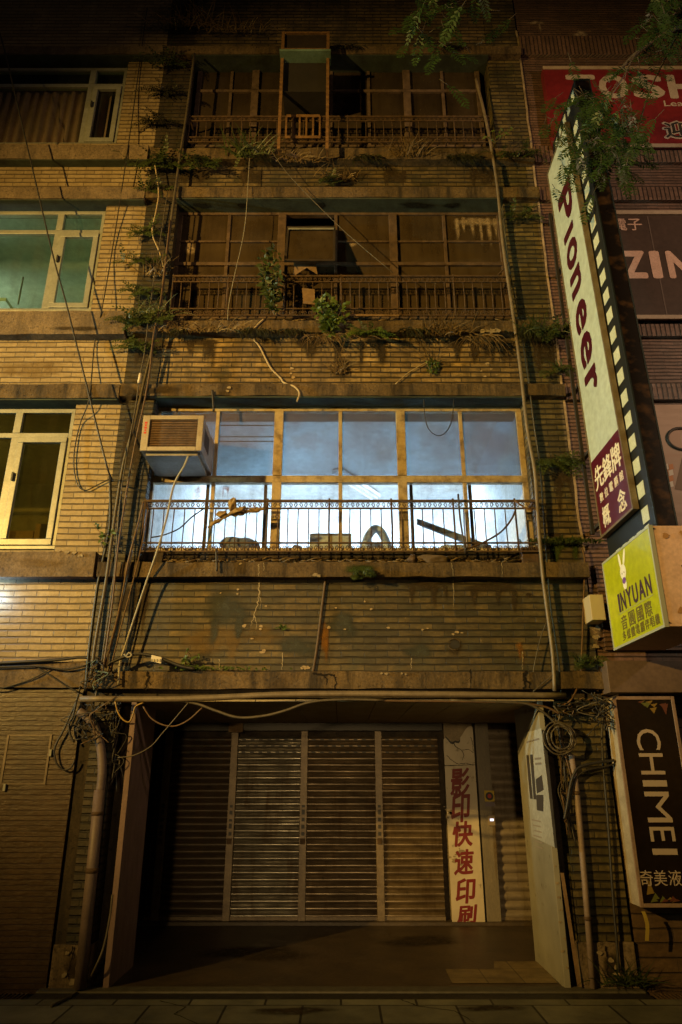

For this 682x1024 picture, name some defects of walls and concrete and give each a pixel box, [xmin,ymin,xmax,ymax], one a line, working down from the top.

damp [403,203,497,236]